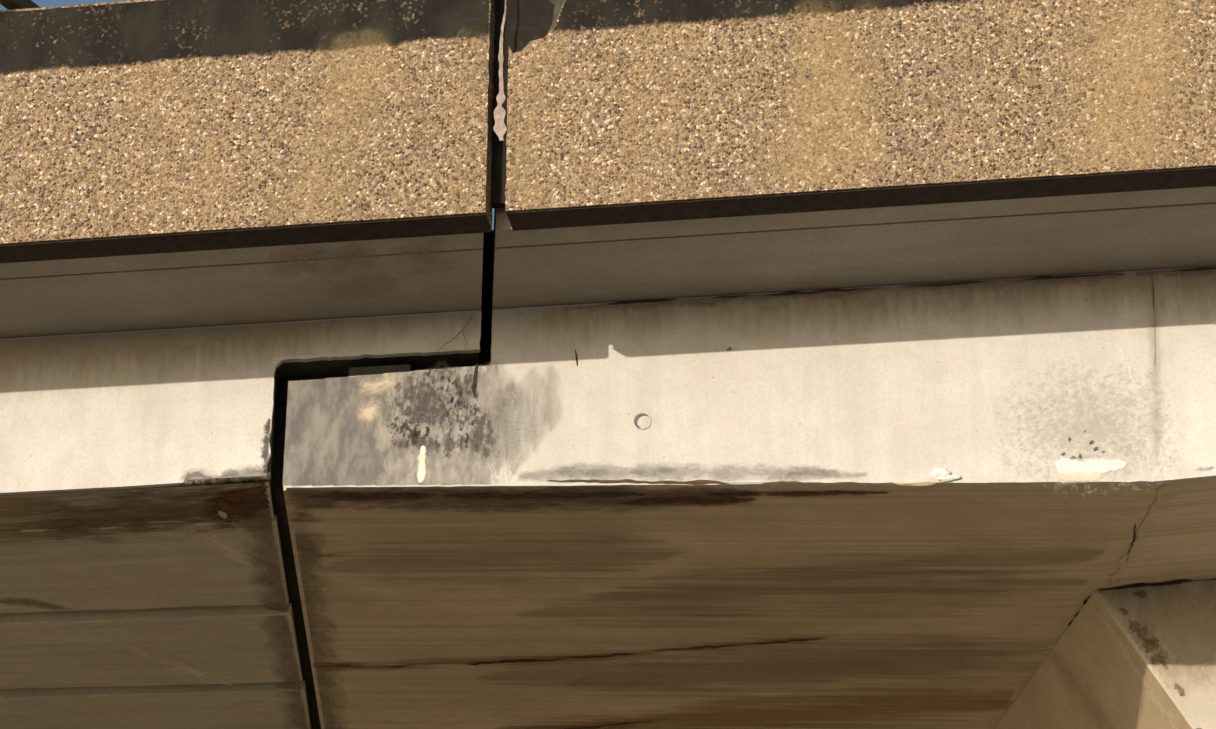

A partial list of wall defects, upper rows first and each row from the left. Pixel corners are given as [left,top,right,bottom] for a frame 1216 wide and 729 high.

spalling [548,0,565,33]
damp [282,361,961,522]
damp [0,485,269,535]
corrosion [205,481,270,527]
crack [1068,485,1215,626]